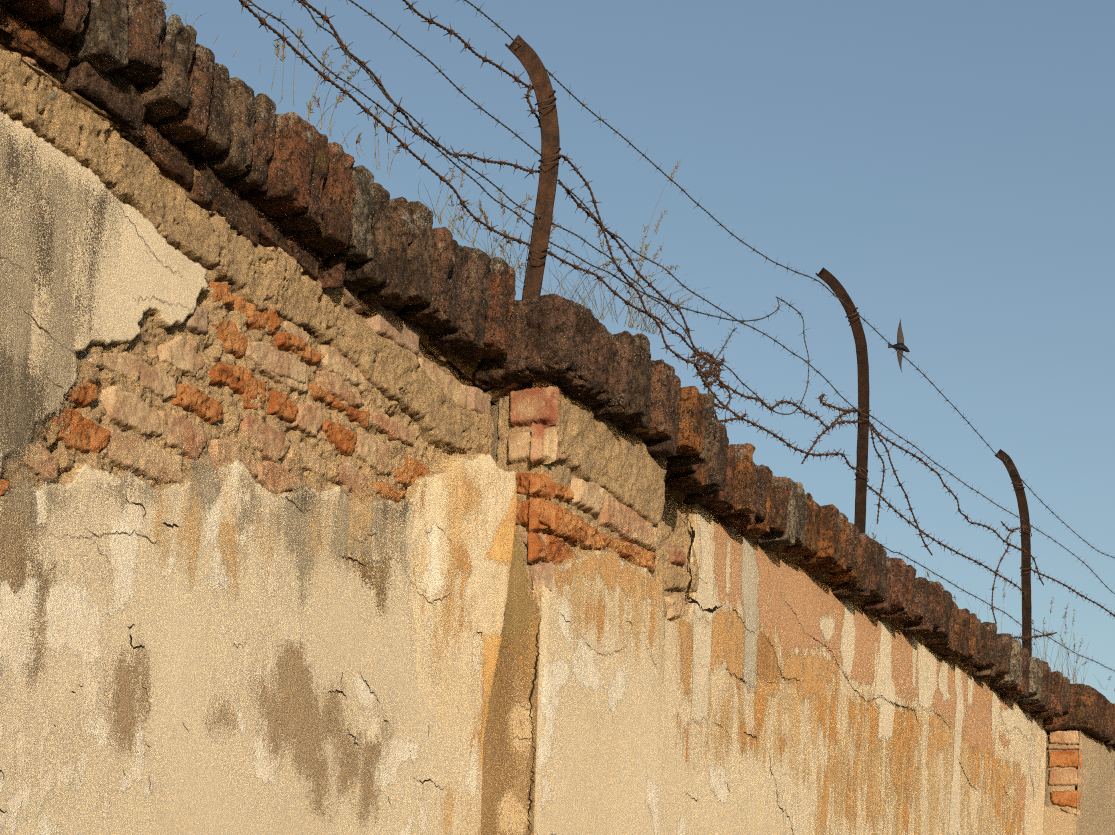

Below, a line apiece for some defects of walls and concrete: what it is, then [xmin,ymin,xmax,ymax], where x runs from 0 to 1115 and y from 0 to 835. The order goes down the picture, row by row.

damp [0,107,414,703]
spalling [0,260,459,835]
peeling [496,598,627,835]
crack [512,596,657,835]
spalling [508,385,700,620]
damp [690,510,759,725]
damp [819,599,856,680]
peeling [713,516,1016,758]
damp [874,619,898,744]
damp [912,636,974,835]
damp [992,689,1030,742]
spalling [1015,723,1083,823]